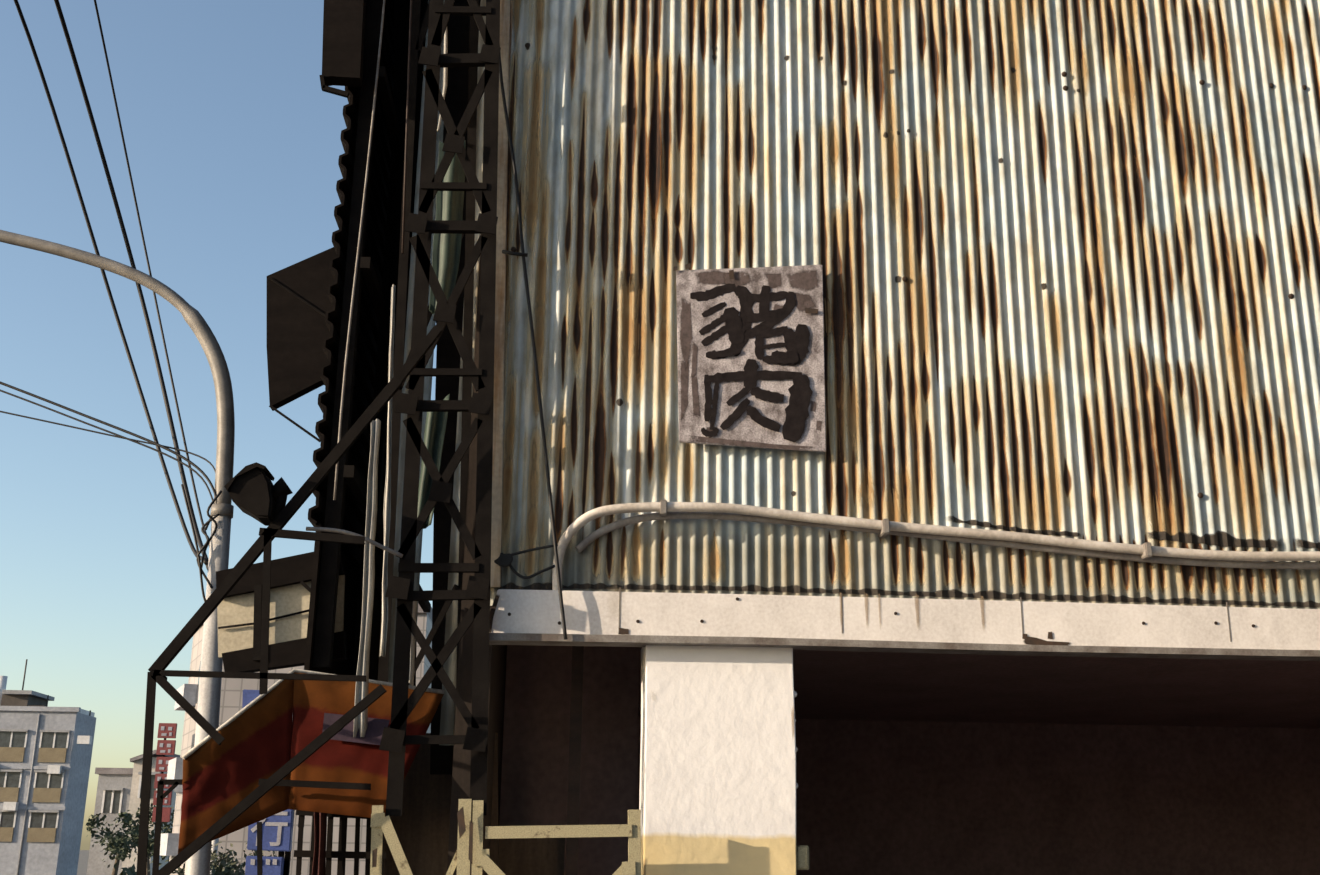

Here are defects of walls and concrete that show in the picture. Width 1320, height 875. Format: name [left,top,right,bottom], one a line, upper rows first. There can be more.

corrosion [501,0,754,582]
corrosion [815,0,1071,625]
corrosion [1062,0,1289,594]
corrosion [1271,0,1320,118]
corrosion [1290,153,1320,289]